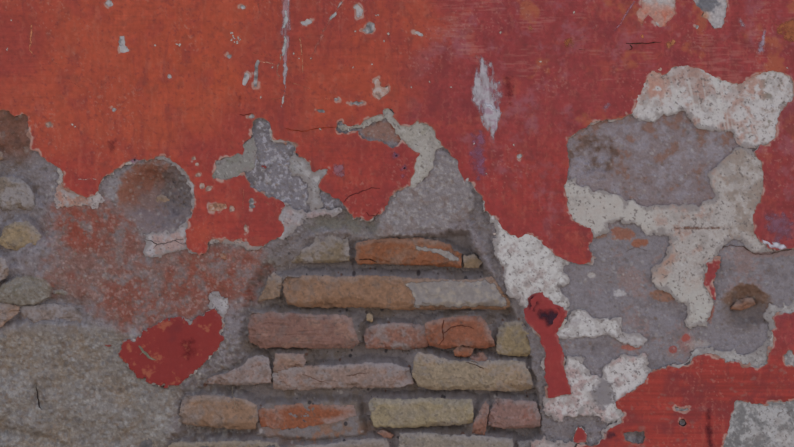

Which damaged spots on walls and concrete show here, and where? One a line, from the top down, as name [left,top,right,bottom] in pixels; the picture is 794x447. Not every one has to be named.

peeling [242,60,260,87]
peeling [373,79,389,100]
flaking render [490,65,794,425]
flaking render [0,108,612,447]
flaking render [624,431,645,444]
peeling [723,400,794,447]